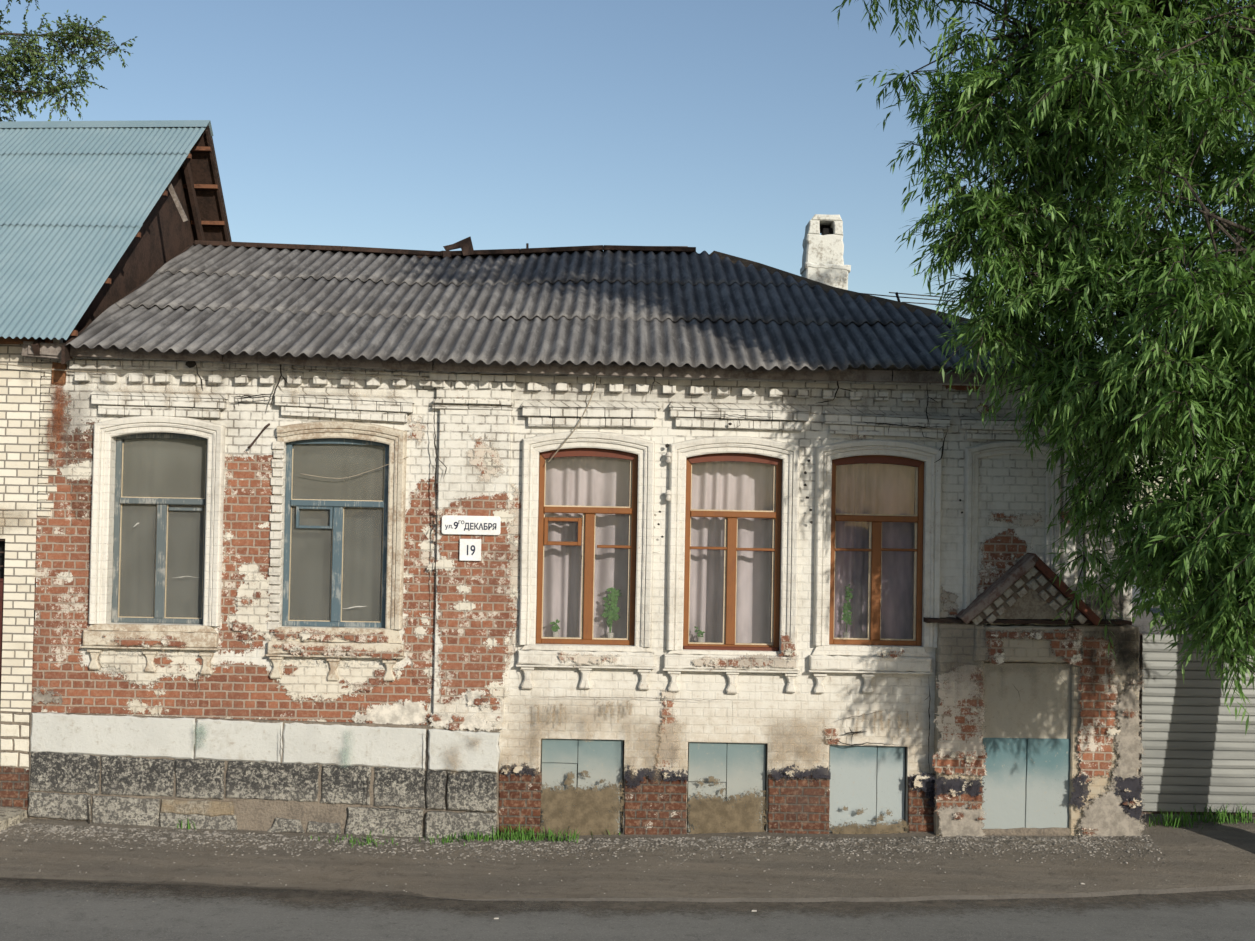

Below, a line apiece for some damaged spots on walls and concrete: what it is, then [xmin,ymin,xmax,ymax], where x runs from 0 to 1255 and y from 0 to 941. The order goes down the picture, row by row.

peeling [31,392,522,731]
peeling [977,509,1042,594]
peeling [912,627,1144,823]